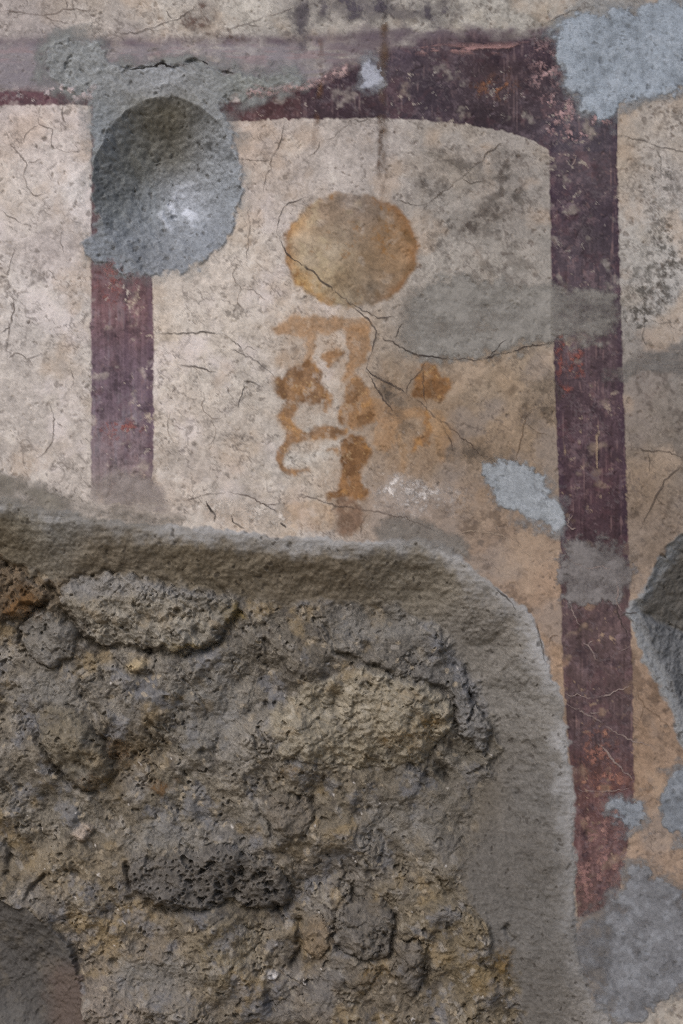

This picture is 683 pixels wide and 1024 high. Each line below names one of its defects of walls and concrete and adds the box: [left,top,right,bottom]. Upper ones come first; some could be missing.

crack [278,199,332,287]
crack [358,308,440,408]
spalling [0,499,625,1024]